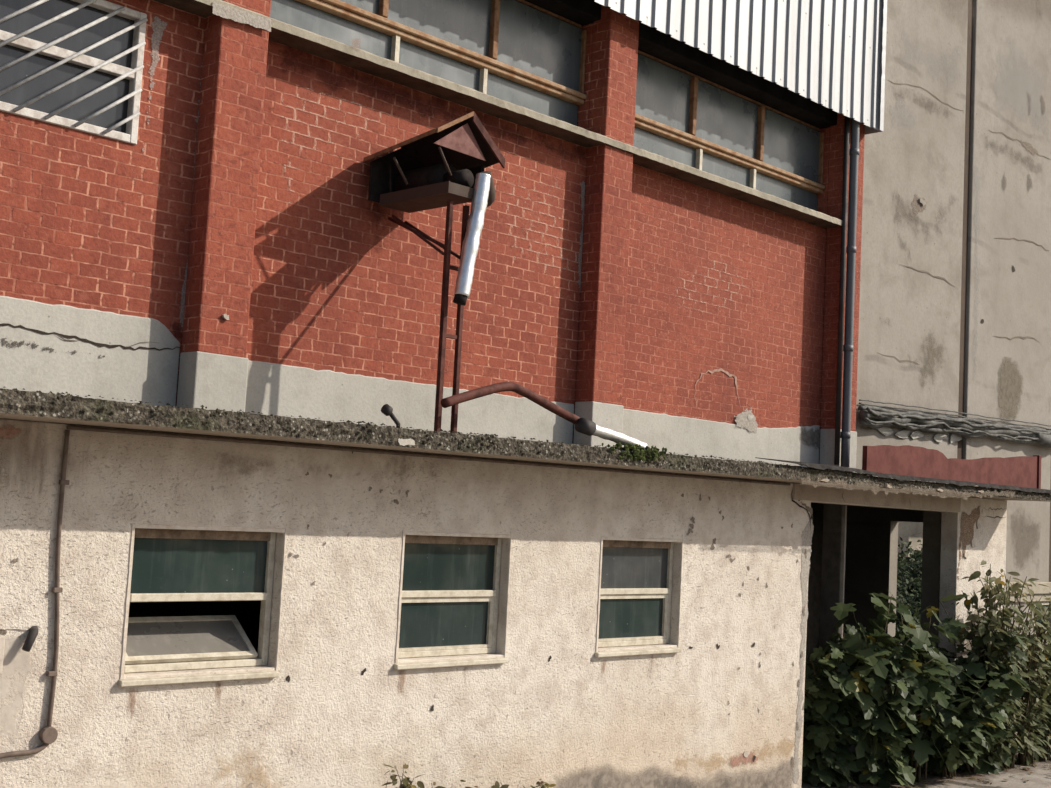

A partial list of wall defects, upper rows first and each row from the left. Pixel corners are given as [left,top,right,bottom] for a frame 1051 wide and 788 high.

crack [890,81,963,111]
crack [989,130,1051,166]
crack [0,323,180,351]
leakage [999,359,1022,423]
spalling [734,409,758,433]
crack [0,629,28,740]